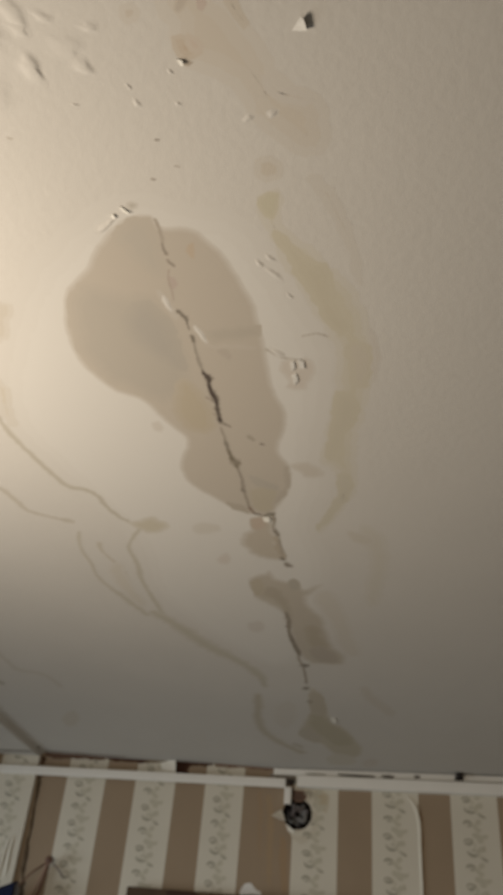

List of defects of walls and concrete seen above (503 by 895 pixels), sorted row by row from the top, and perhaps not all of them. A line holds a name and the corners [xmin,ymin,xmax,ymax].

peeling [292,16,307,31]
water stain [0,174,382,768]
crack [153,218,293,567]
crack [284,612,313,703]